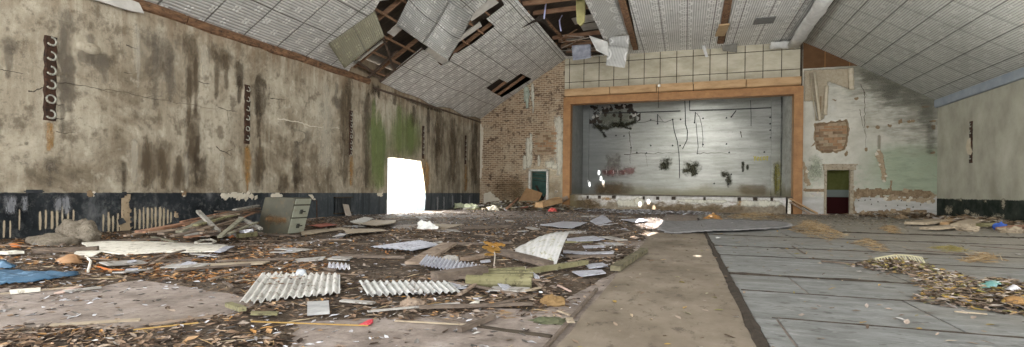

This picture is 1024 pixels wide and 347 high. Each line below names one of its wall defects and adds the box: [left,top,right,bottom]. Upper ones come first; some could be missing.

crack [0,44,235,154]
damp [141,40,205,188]
damp [211,46,243,103]
damp [254,76,265,187]
damp [279,163,301,191]
crack [270,98,345,161]
damp [341,79,352,183]
damp [365,85,385,187]
peeling [804,68,859,156]
flaking render [698,148,1010,235]